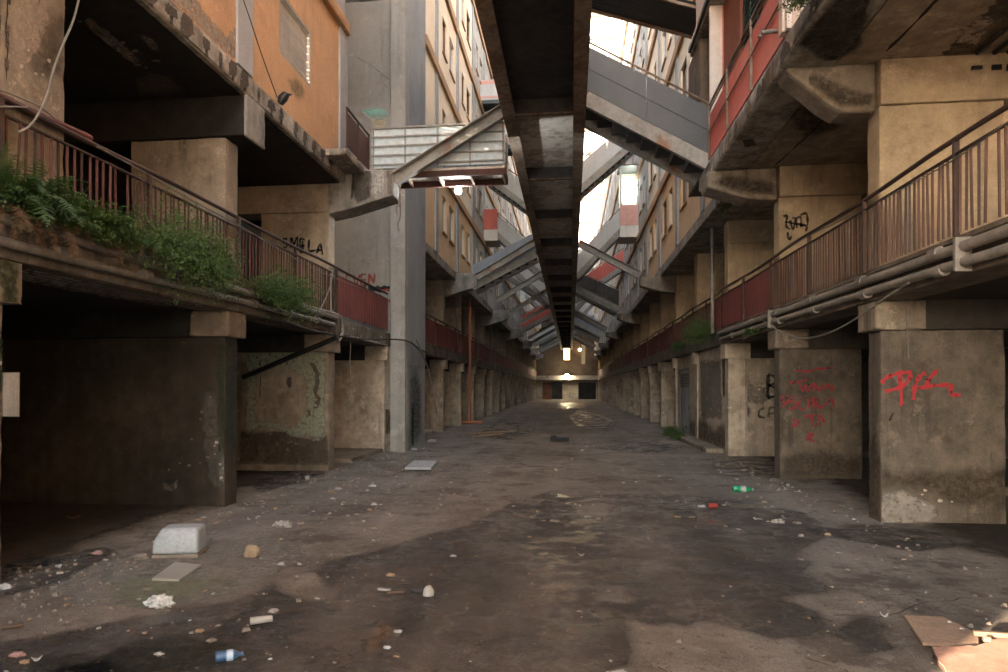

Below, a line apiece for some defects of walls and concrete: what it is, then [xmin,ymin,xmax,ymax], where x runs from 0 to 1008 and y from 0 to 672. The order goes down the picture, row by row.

damp [38,22,60,75]
damp [793,0,873,61]
peeling [162,392,224,493]
damp [186,340,328,491]